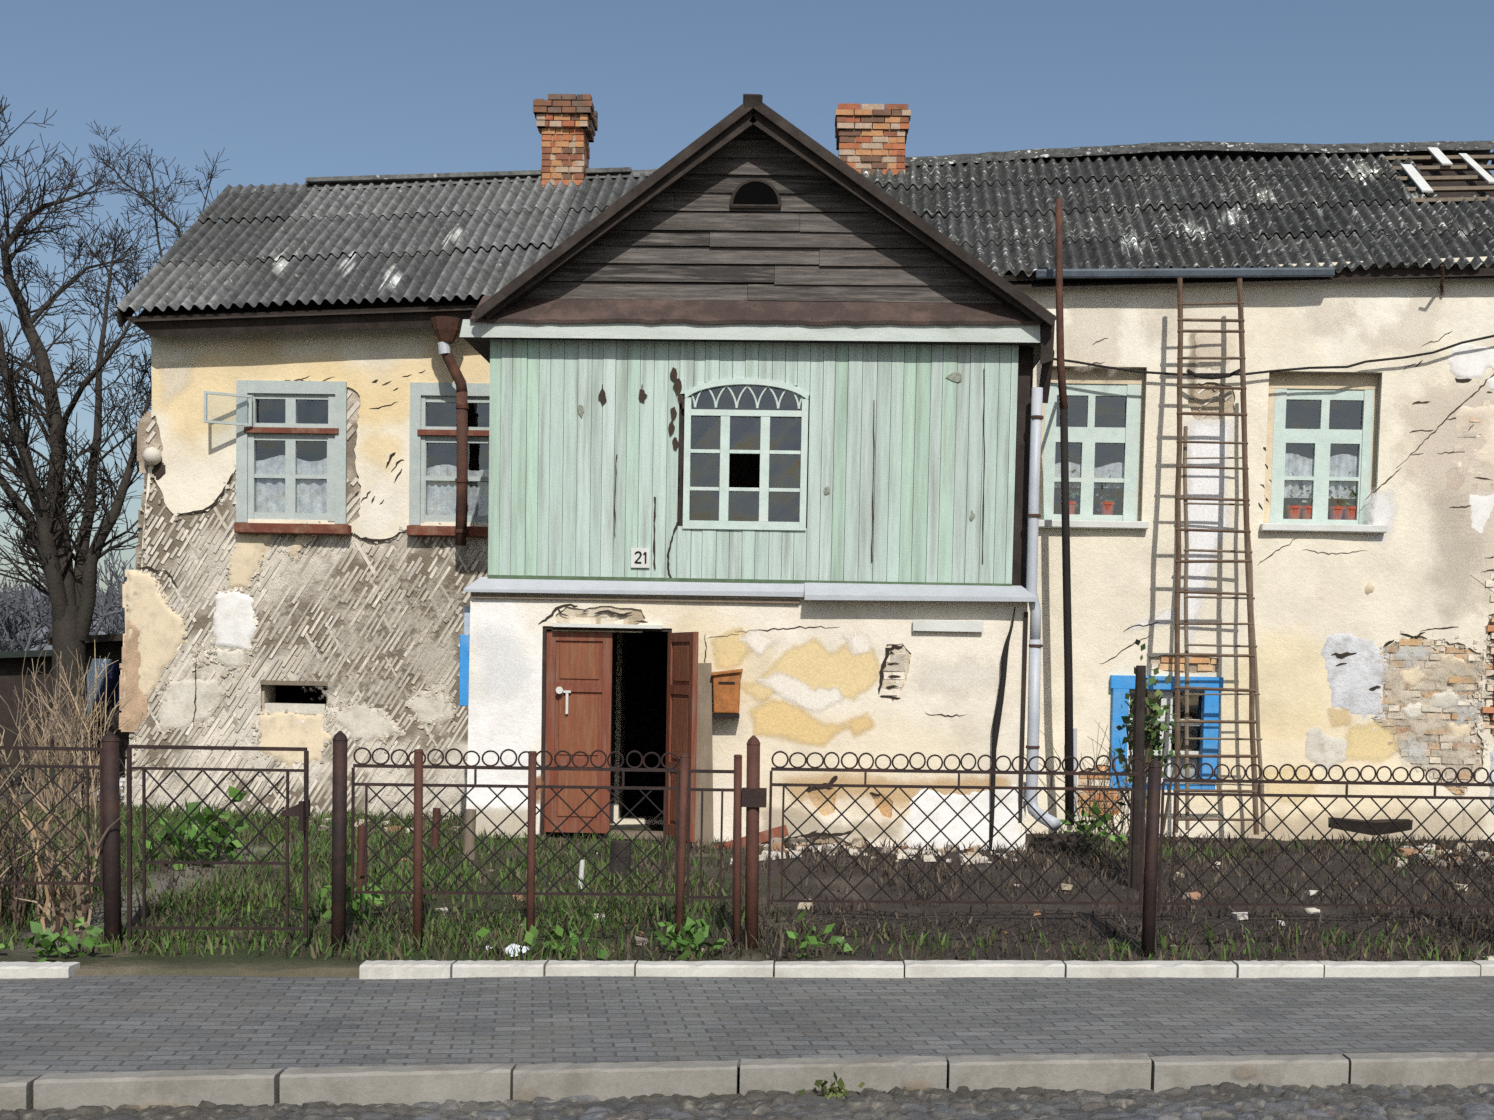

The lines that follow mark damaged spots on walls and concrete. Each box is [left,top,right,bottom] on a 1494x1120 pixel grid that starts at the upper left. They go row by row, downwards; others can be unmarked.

crack [1365,374,1494,500]
spalling [152,459,166,483]
flaking render [1369,389,1494,810]
peeling [119,533,310,732]
peeling [257,703,406,768]
peeling [405,691,453,725]
peeling [739,630,775,654]
peeling [759,673,843,711]
spalling [844,632,911,702]